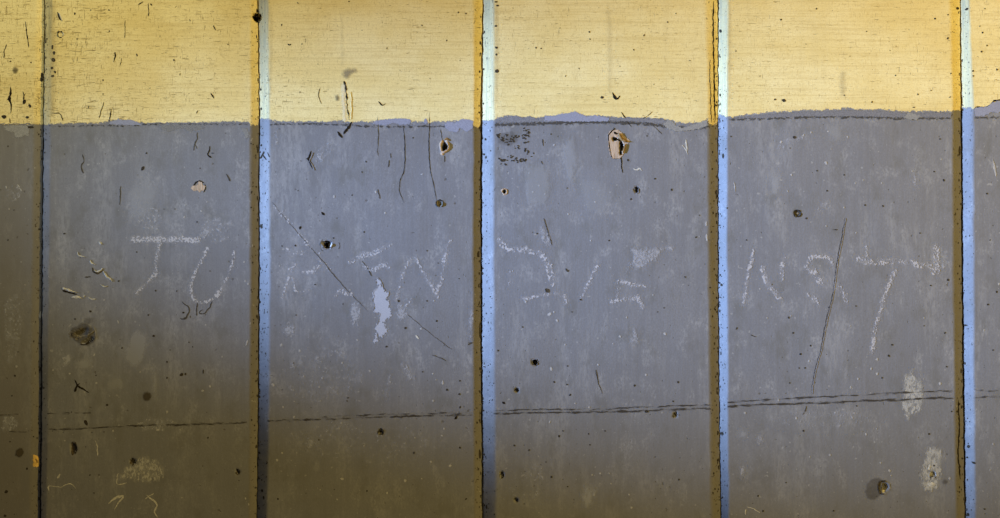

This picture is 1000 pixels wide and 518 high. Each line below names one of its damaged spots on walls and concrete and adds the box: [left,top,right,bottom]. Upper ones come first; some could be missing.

peeling [496,111,708,166]
peeling [372,277,400,347]
crack [811,218,846,394]